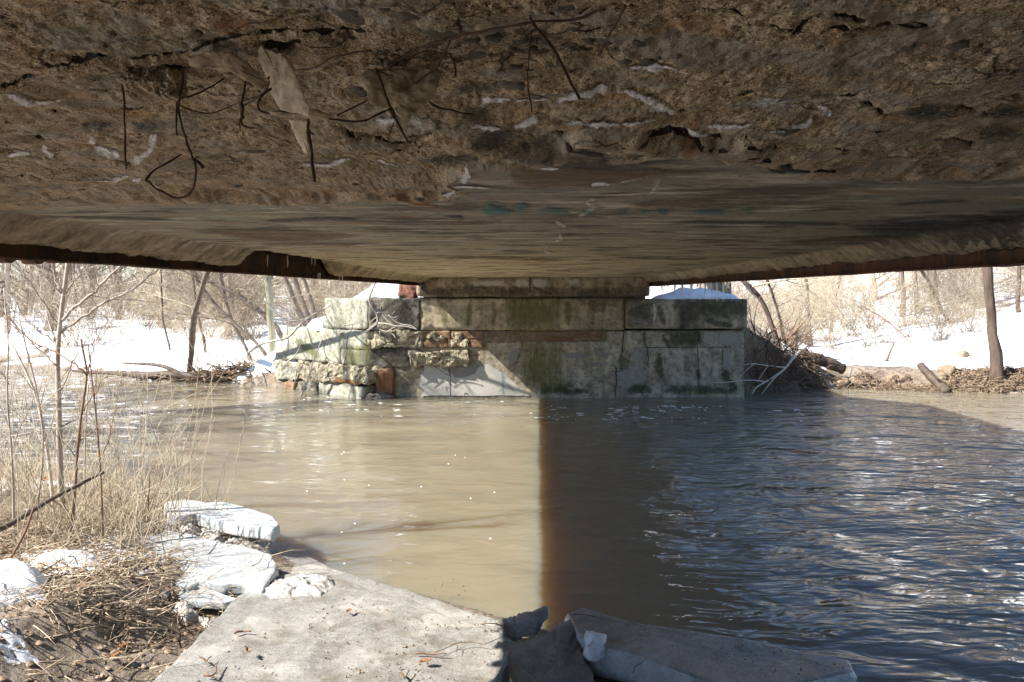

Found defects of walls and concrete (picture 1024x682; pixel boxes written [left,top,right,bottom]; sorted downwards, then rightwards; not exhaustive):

efflorescence [7,94,61,107]
spalling [0,0,1024,210]
efflorescence [8,145,54,158]
damp [82,121,120,159]
damp [133,122,157,165]
damp [425,82,674,197]